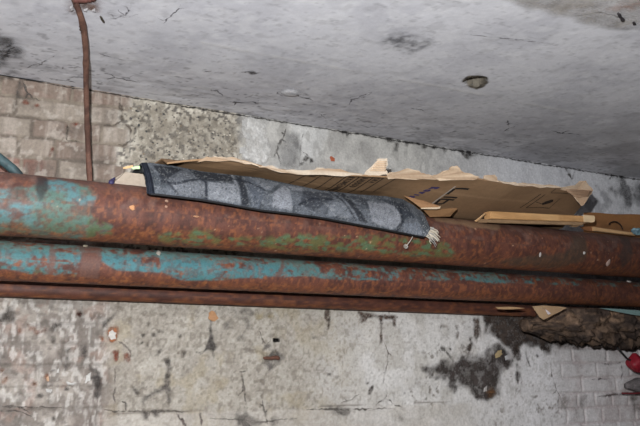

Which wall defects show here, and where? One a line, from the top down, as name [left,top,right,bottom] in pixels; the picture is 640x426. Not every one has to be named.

leakage [0,38,19,60]
crack [23,56,639,180]
spalling [463,75,488,89]
leakage [423,315,572,399]